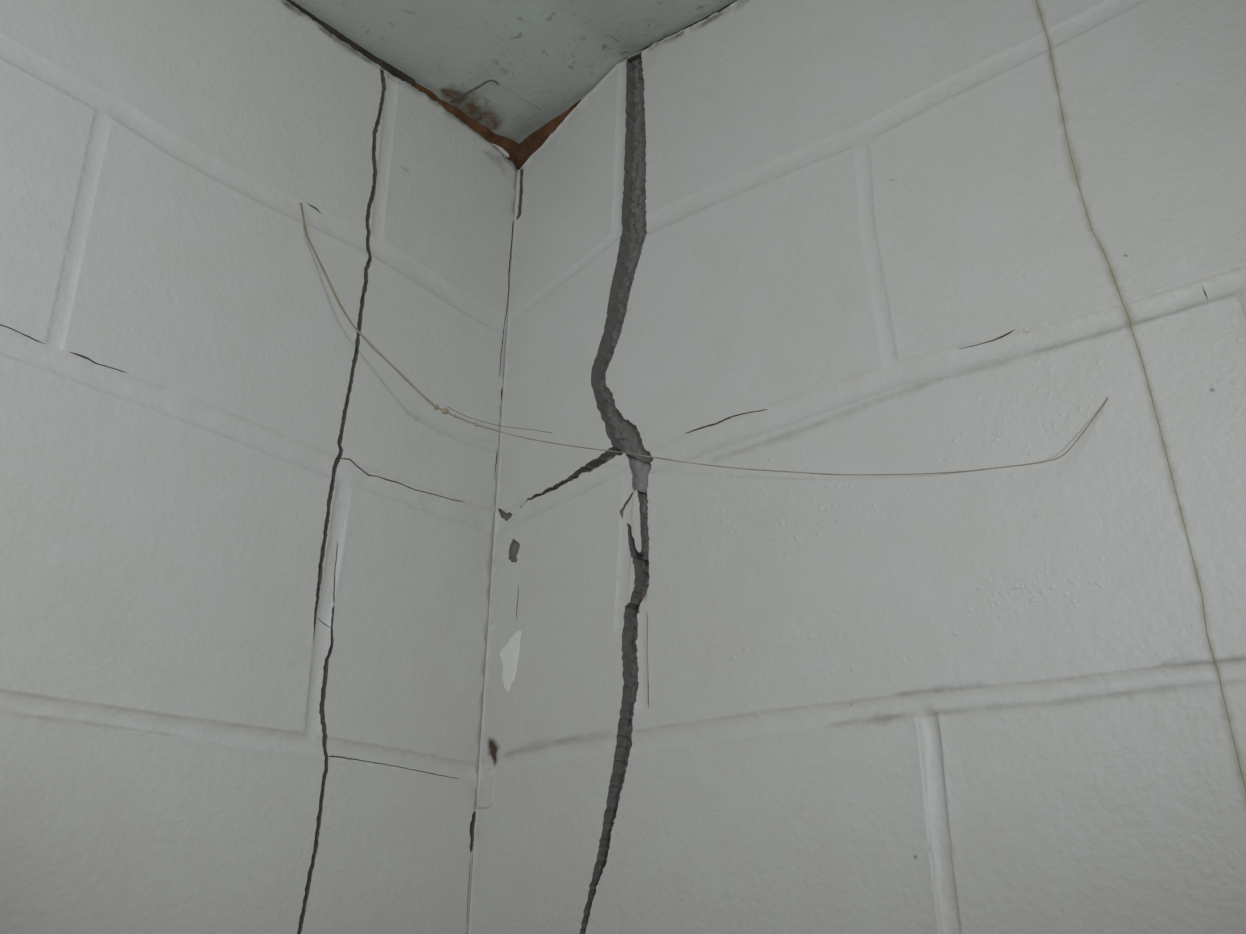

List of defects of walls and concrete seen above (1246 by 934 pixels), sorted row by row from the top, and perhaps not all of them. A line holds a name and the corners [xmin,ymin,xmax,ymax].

crack [297,69,463,934]
peeling [499,630,522,693]
crack [499,169,523,402]
crack [521,53,653,934]